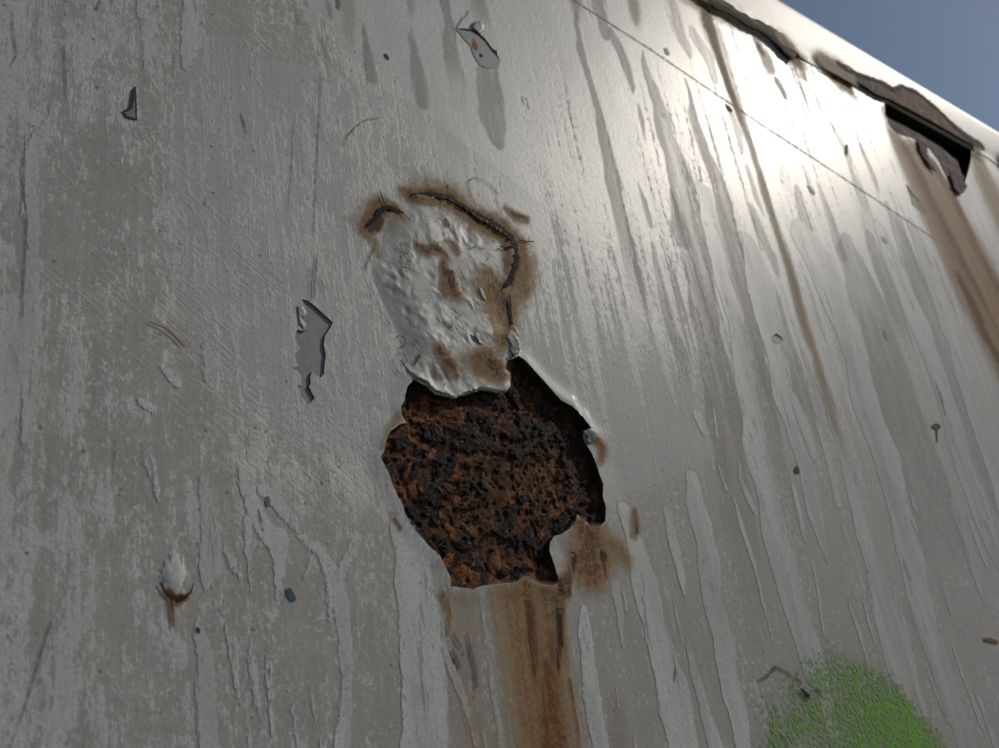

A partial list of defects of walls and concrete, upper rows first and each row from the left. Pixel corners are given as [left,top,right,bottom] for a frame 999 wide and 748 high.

peeling [122,87,137,121]
peeling [294,299,333,405]
peeling [456,10,501,68]
rust [595,434,607,465]
rust [698,0,840,434]
rust [754,30,858,99]
damp [693,181,999,748]
rust [882,105,999,373]
damp [389,511,506,748]
rust [491,508,641,748]
damp [577,603,609,748]
damp [610,470,751,748]